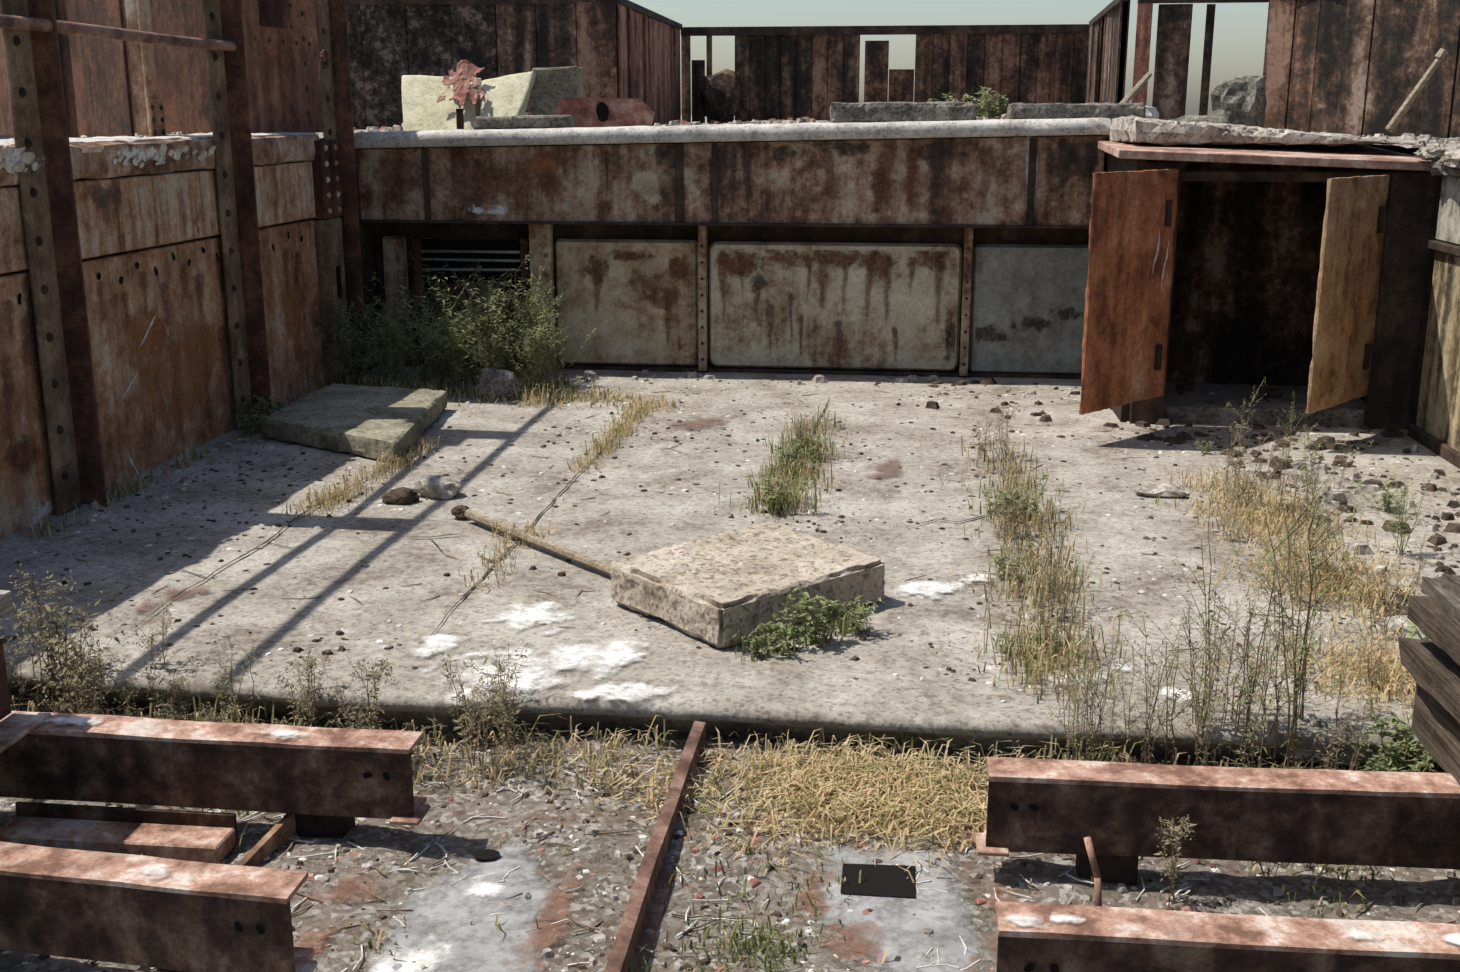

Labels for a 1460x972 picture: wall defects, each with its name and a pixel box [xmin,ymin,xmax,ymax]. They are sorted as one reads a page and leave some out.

peeling [0,145,38,174]
peeling [113,143,216,168]
rust [871,142,944,213]
spalling [1413,143,1460,169]
rust [99,257,223,320]
rust [588,250,688,339]
rust [717,249,949,322]
rust [0,287,43,473]